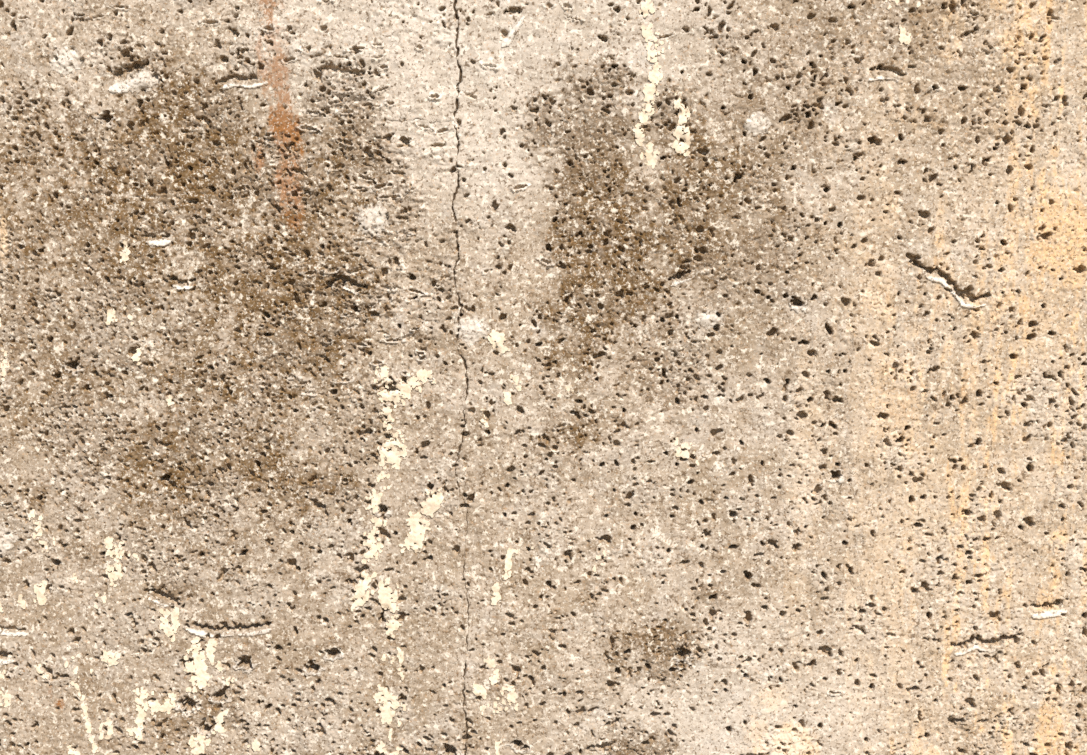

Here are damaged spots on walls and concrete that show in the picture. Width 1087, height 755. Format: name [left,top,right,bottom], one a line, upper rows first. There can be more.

corrosion [250,0,308,236]
leakage [0,33,427,622]
crack [384,0,469,755]
peeling [487,329,510,356]
leakage [503,0,1087,755]
peeling [93,536,140,609]
peeling [350,365,437,681]
peeling [399,489,444,553]
peeling [491,545,535,605]
peeling [64,597,260,755]
peeling [362,684,406,755]
peeling [472,656,519,717]